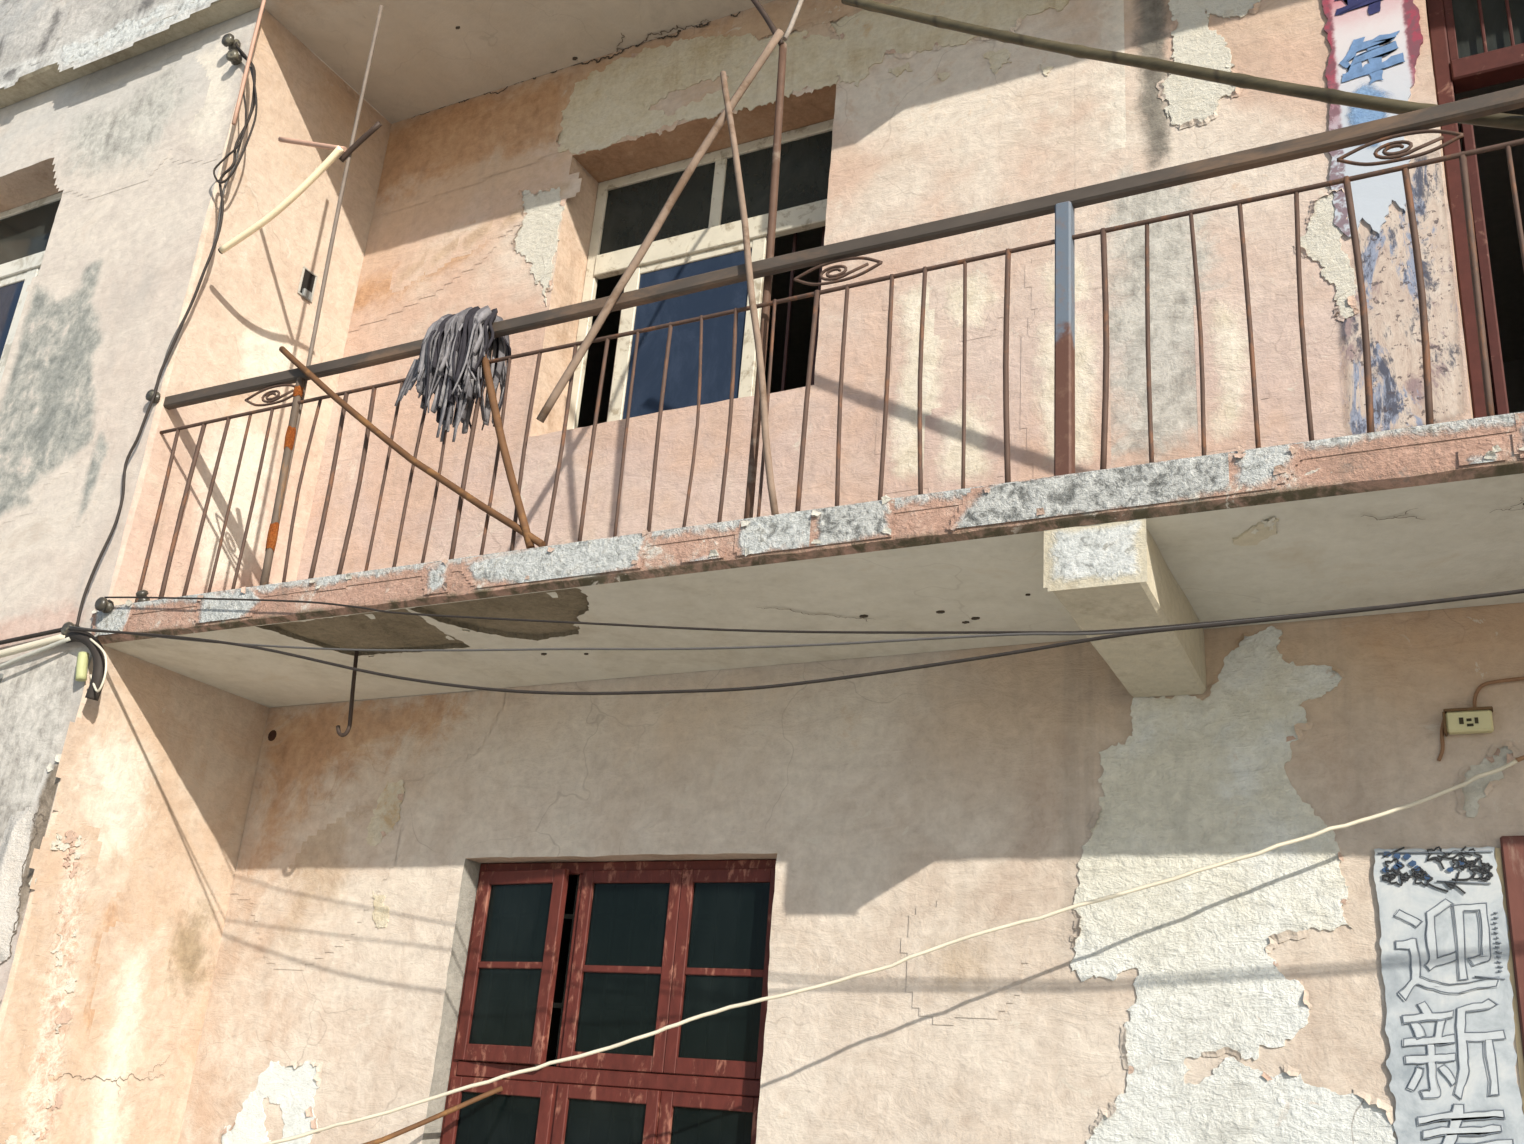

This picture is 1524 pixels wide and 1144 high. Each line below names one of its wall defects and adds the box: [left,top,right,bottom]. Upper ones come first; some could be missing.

damp [0,0,72,89]
damp [129,0,158,21]
peeling [554,0,1126,189]
damp [1087,0,1212,186]
peeling [1156,0,1262,130]
peeling [511,187,567,306]
damp [1074,175,1270,469]
peeling [0,241,1524,1144]
crack [0,798,47,1003]